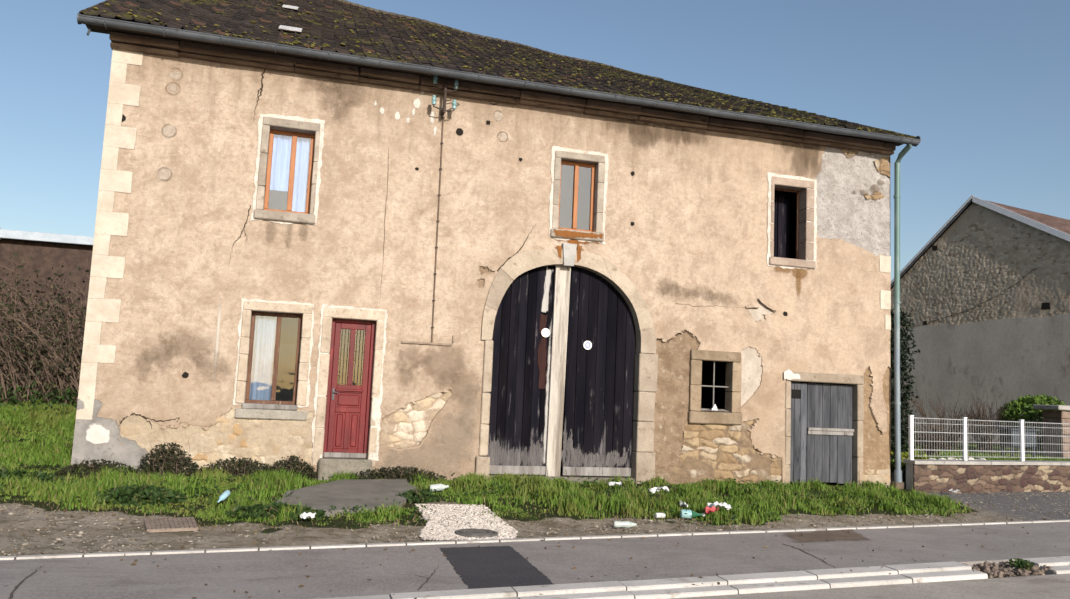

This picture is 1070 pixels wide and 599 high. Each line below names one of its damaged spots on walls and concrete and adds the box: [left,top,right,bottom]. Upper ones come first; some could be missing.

crack [254,69,266,112]
crack [229,205,251,264]
crack [497,224,536,272]
peeling [815,147,891,256]
spalling [119,408,314,477]
spalling [381,389,452,448]
spalling [654,330,782,484]
peeling [862,368,891,488]